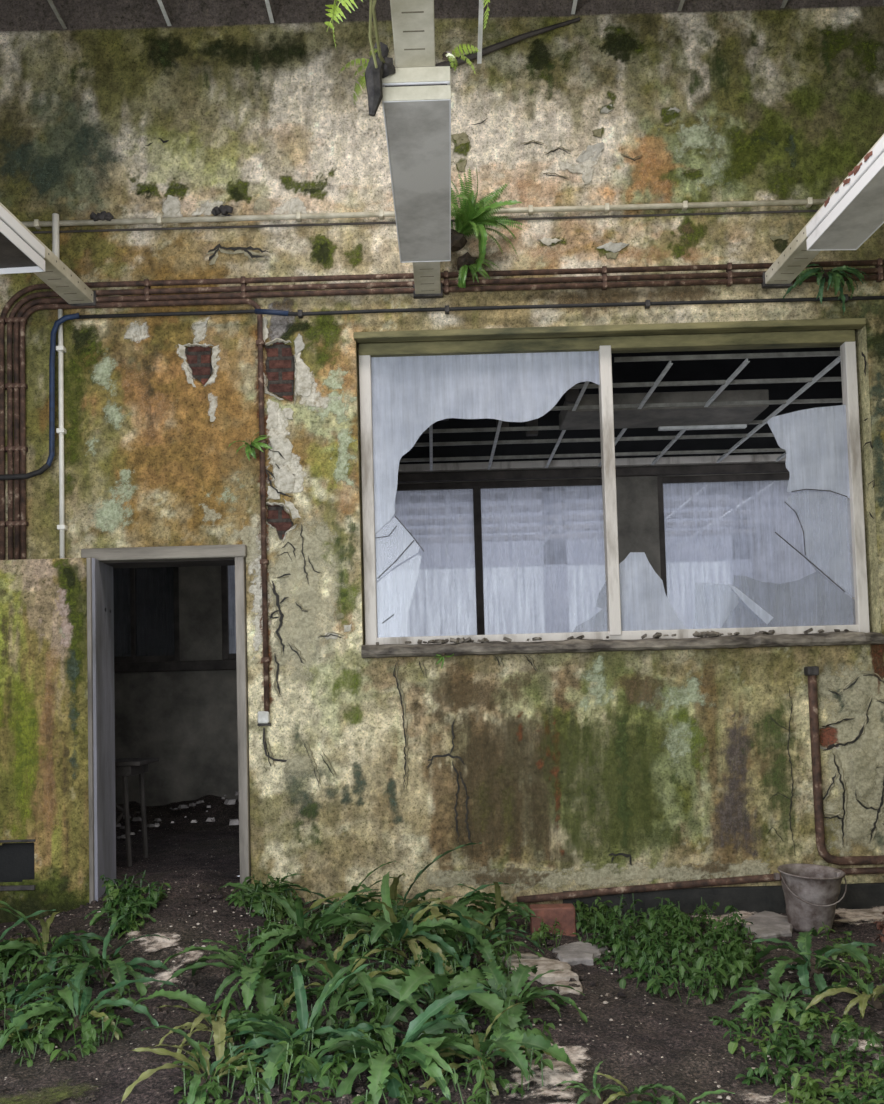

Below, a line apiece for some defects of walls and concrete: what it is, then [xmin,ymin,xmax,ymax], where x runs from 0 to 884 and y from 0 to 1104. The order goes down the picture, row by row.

crack [206,243,270,265]
flaking render [177,318,220,422]
peeling [203,504,221,521]
crack [266,449,294,497]
peeling [234,317,352,682]
crack [268,524,344,697]
corrosion [871,644,884,688]
crack [393,661,473,848]
damp [427,669,770,892]
crack [767,682,795,853]
crack [822,672,884,847]